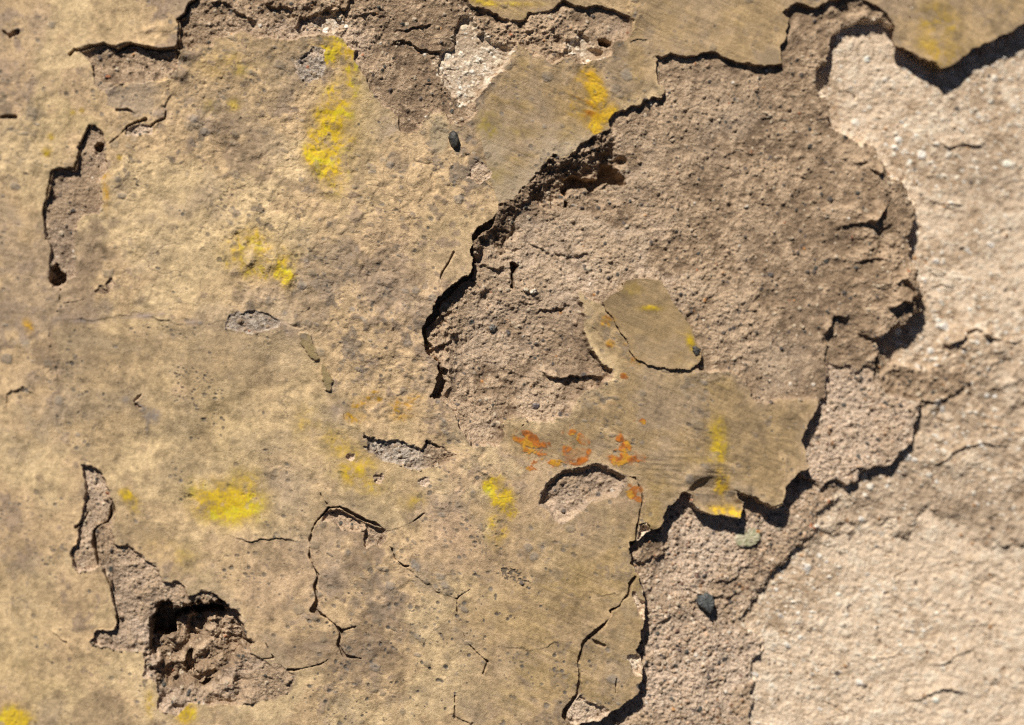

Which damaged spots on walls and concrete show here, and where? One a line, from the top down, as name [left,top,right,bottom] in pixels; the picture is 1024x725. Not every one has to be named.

flaking render [0,0,829,204]
flaking render [42,124,109,289]
flaking render [225,310,281,335]
flaking render [346,435,458,487]
flaking render [422,117,970,725]
flaking render [69,464,296,717]
crack [262,484,410,672]
crack [456,594,489,675]
crack [562,576,637,725]